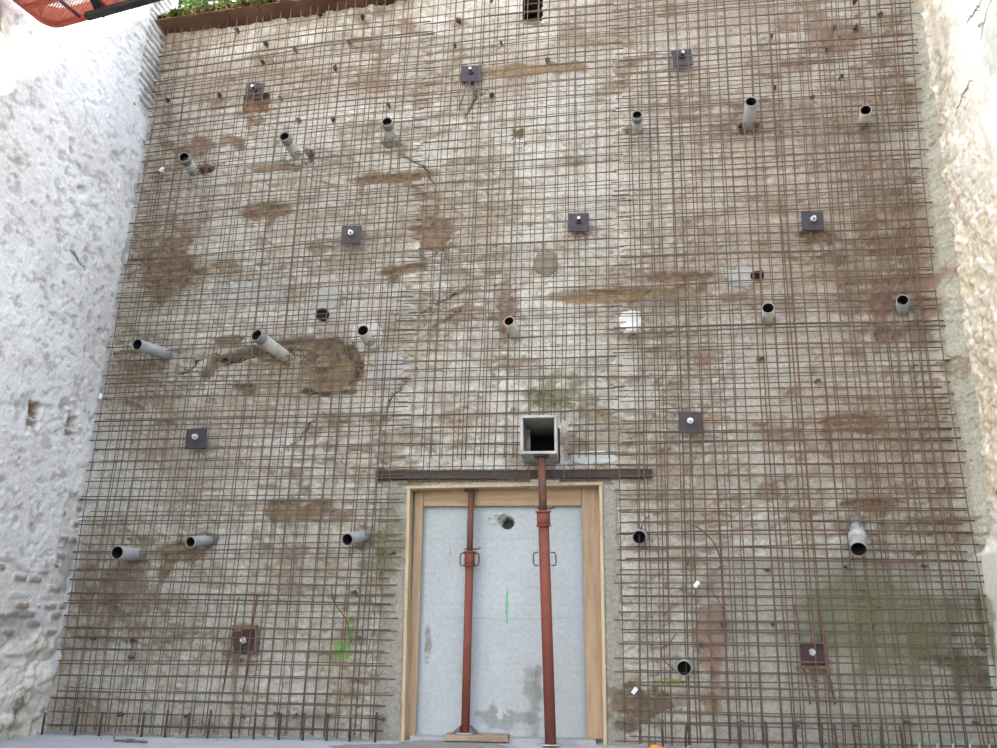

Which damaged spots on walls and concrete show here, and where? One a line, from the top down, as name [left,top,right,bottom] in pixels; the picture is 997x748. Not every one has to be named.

rust [139,234,197,304]